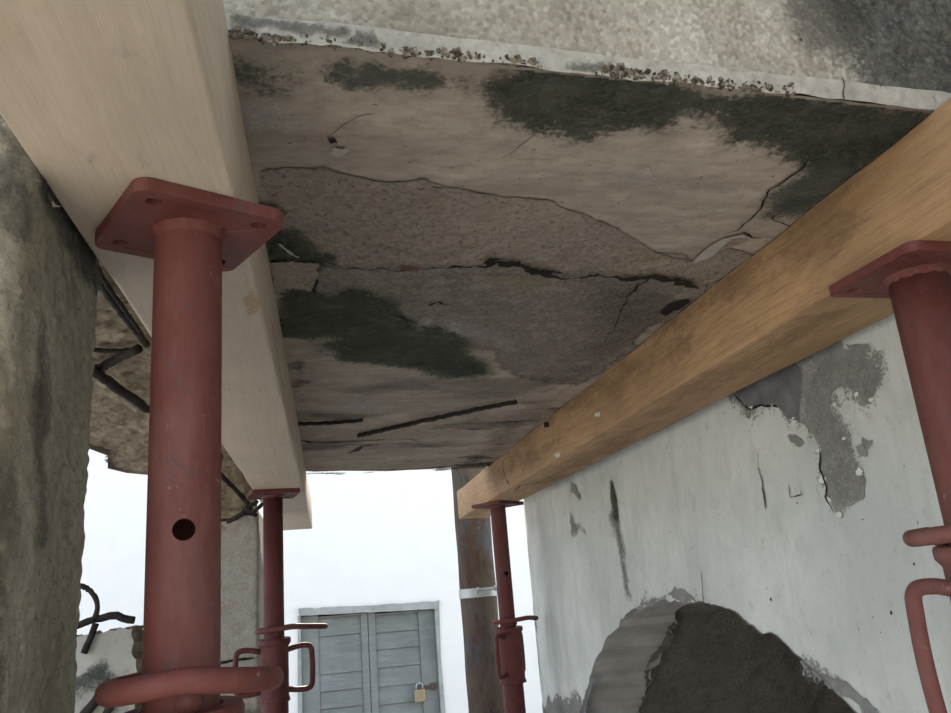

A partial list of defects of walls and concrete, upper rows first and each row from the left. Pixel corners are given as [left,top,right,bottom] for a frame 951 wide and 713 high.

crack [724,157,810,238]
leakage [761,134,900,220]
crack [312,258,699,343]
spalling [89,261,152,471]
peeling [728,340,888,519]
spalling [221,443,263,535]
flaking render [636,587,697,617]
flaking render [542,677,596,713]
flaking render [640,614,684,705]
flaking render [799,653,879,713]